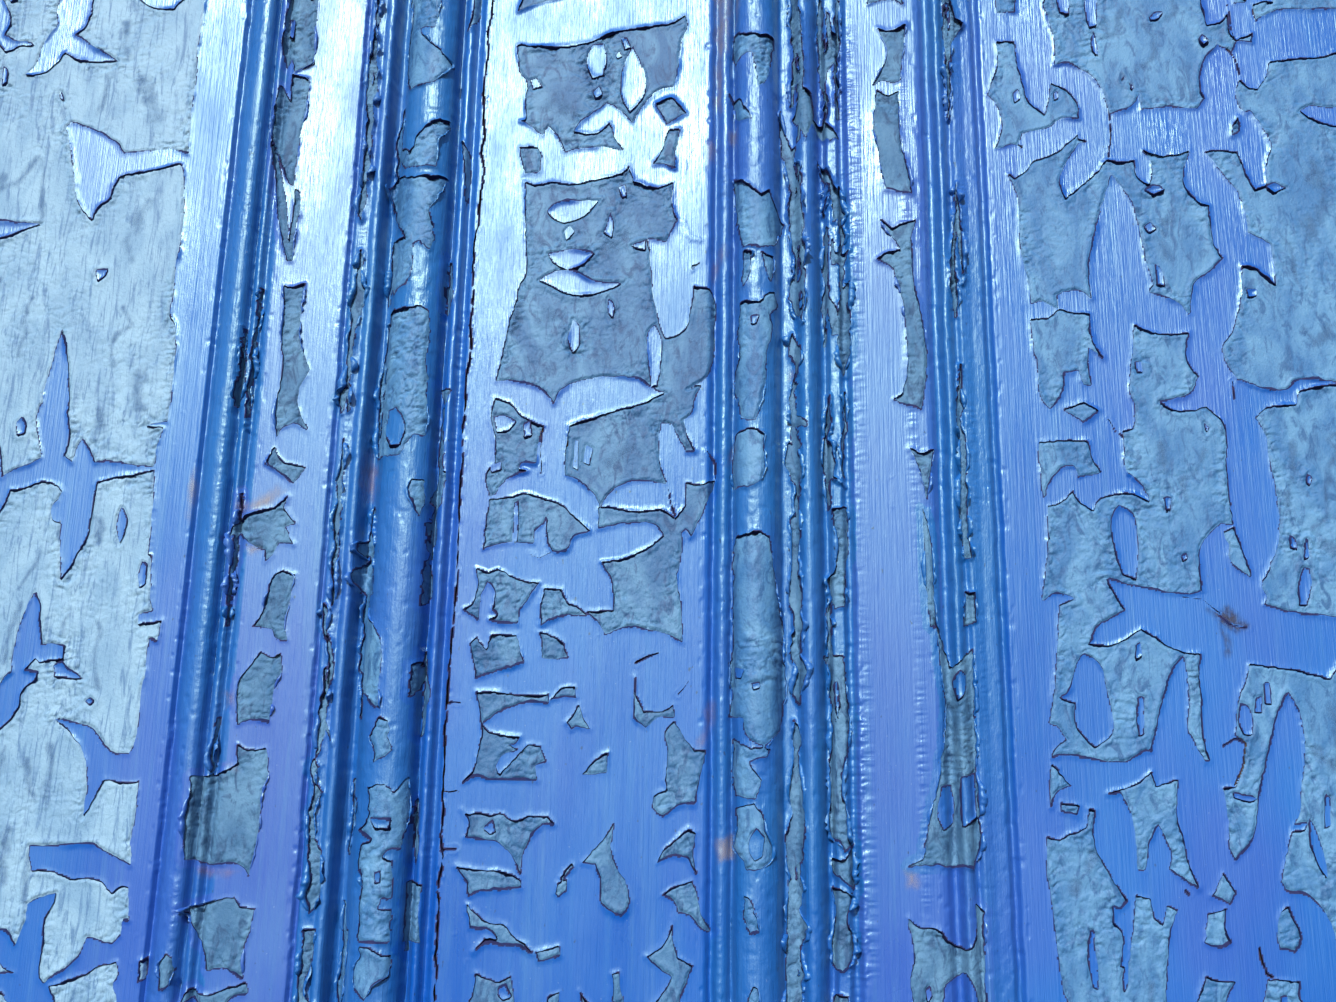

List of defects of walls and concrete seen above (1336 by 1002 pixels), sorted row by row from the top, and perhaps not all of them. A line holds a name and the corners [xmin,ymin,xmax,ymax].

peeling [0,0,326,1002]
peeling [291,0,476,1002]
peeling [451,0,933,1002]
peeling [900,357,989,878]
peeling [900,895,995,1002]
peeling [936,0,969,128]
peeling [940,176,970,325]
peeling [980,0,1336,1002]